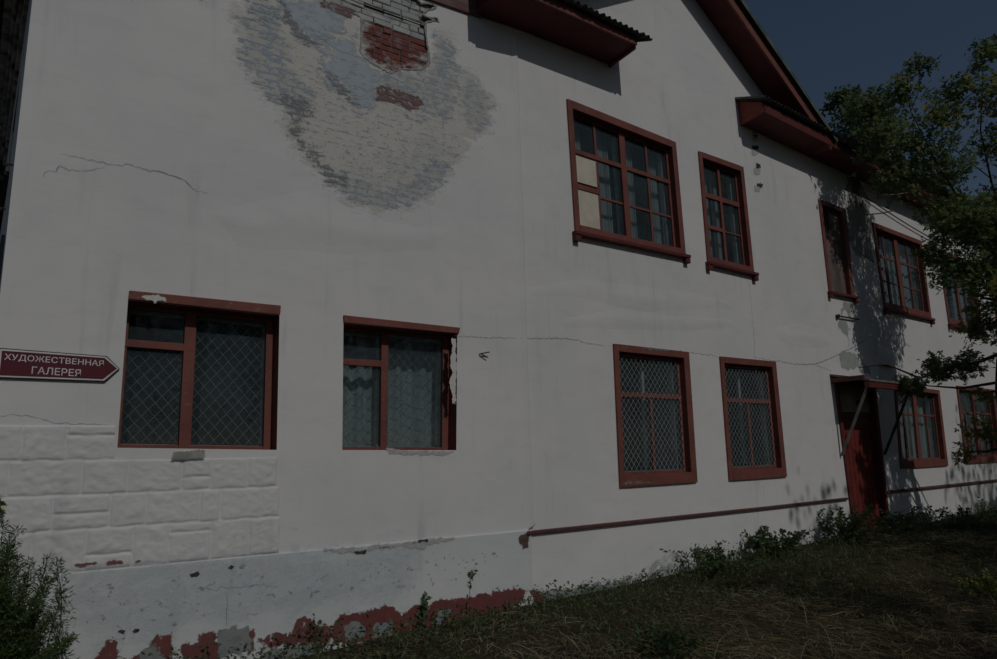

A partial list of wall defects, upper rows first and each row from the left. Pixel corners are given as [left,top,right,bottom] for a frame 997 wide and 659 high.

peeling [230,0,496,213]
flaking render [845,175,875,263]
peeling [449,338,457,404]
peeling [94,578,631,659]